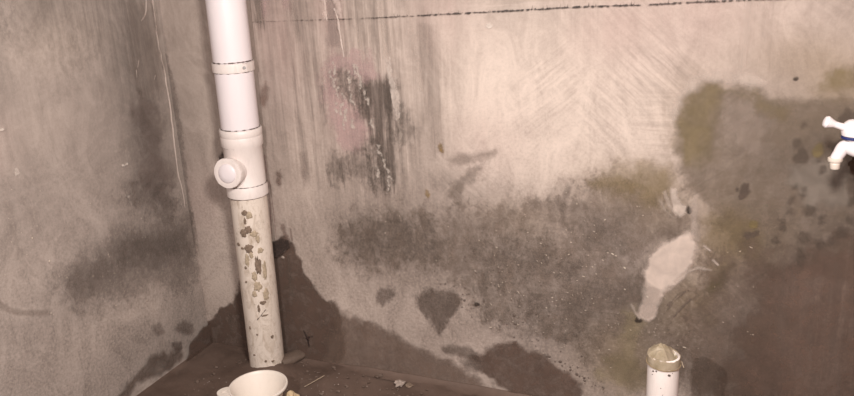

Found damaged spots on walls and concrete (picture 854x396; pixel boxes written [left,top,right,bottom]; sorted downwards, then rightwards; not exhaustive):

damp [365,56,400,185]
damp [119,289,248,396]
damp [272,236,581,396]
flaking render [635,232,718,323]
damp [680,75,854,396]